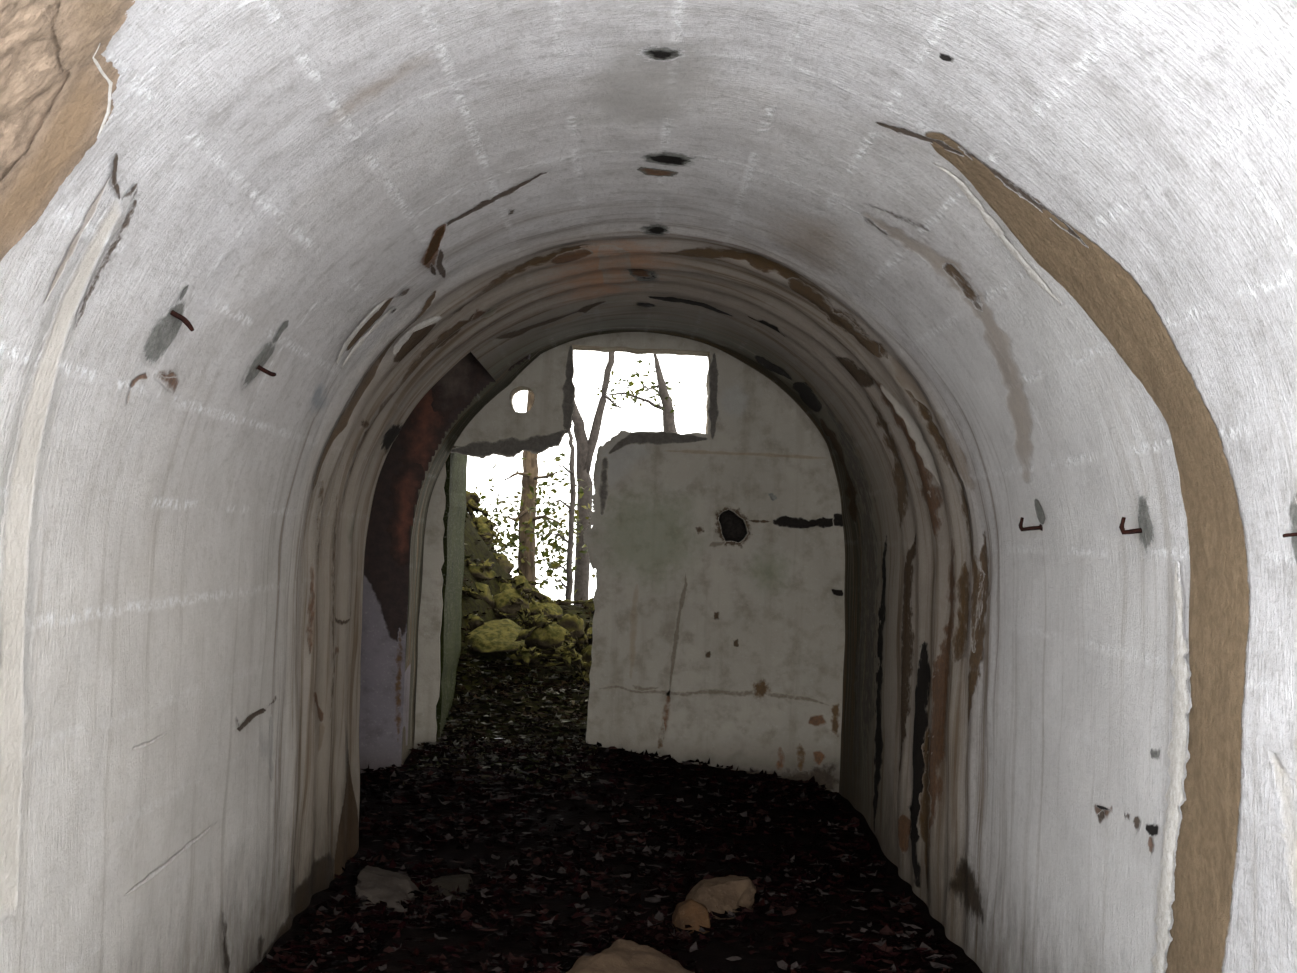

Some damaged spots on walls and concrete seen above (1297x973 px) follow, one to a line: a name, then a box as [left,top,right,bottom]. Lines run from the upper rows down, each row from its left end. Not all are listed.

spalling [0,0,135,263]
crack [419,172,549,279]
rust [385,352,485,568]
crack [495,296,882,768]
spalling [875,122,1251,973]
crack [898,641,932,889]